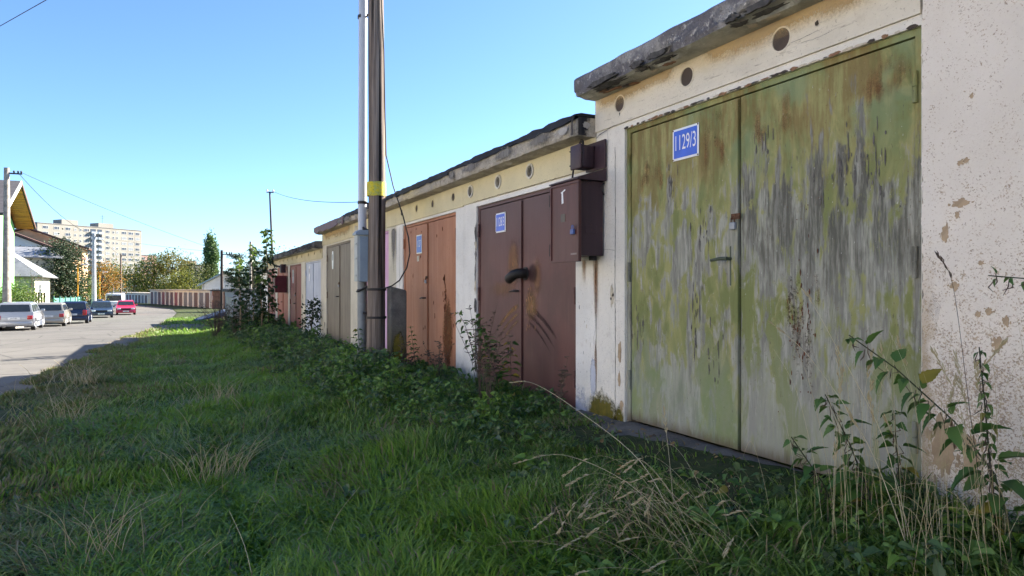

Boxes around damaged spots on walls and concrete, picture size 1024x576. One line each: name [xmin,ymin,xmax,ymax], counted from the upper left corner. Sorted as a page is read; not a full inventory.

damp [601,68,672,104]
flaking render [939,198,974,243]
corrosion [433,274,454,371]
corrosion [500,249,551,341]
corrosion [786,269,819,394]
flaking render [975,307,1011,353]
flaking render [924,413,984,483]